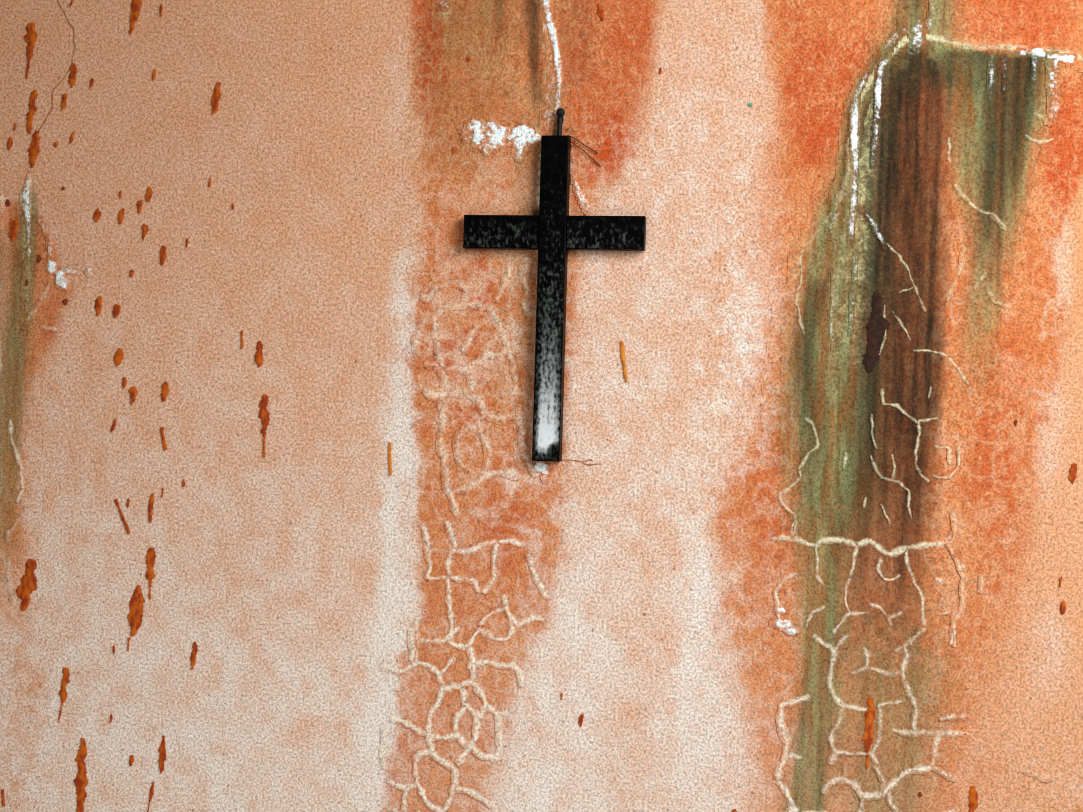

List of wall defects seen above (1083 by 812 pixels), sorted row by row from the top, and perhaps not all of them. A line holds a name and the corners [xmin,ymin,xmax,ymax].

rust [0,181,83,812]
leakage [11,170,94,344]
crack [379,256,599,812]
leakage [458,0,565,215]
leakage [570,145,592,216]
crack [794,254,806,335]
crack [771,386,987,812]
leakage [821,0,938,372]
rust [691,0,1083,812]
crack [879,242,1010,385]
crack [946,137,1007,231]
leakage [986,45,1077,127]